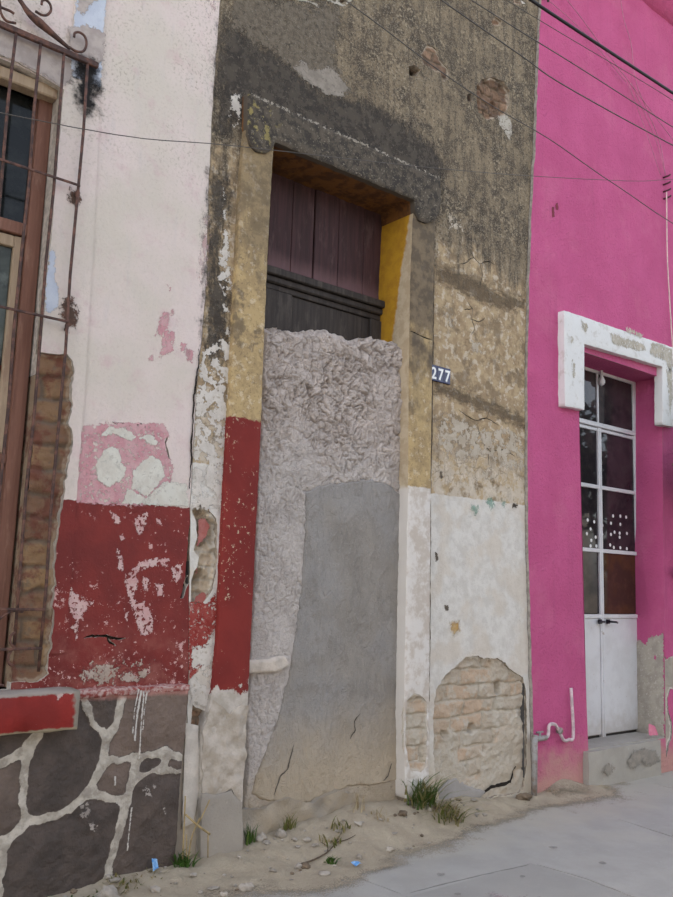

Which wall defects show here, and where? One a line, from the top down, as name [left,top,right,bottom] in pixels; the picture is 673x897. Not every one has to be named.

flaking render [0,0,107,86]
flaking render [409,46,449,81]
peeling [229,93,242,127]
spalling [467,78,512,141]
peeling [217,187,233,312]
flaking render [11,309,249,801]
crack [86,634,123,645]
crack [274,745,294,794]
flaking render [401,656,526,798]
peeling [628,634,673,769]